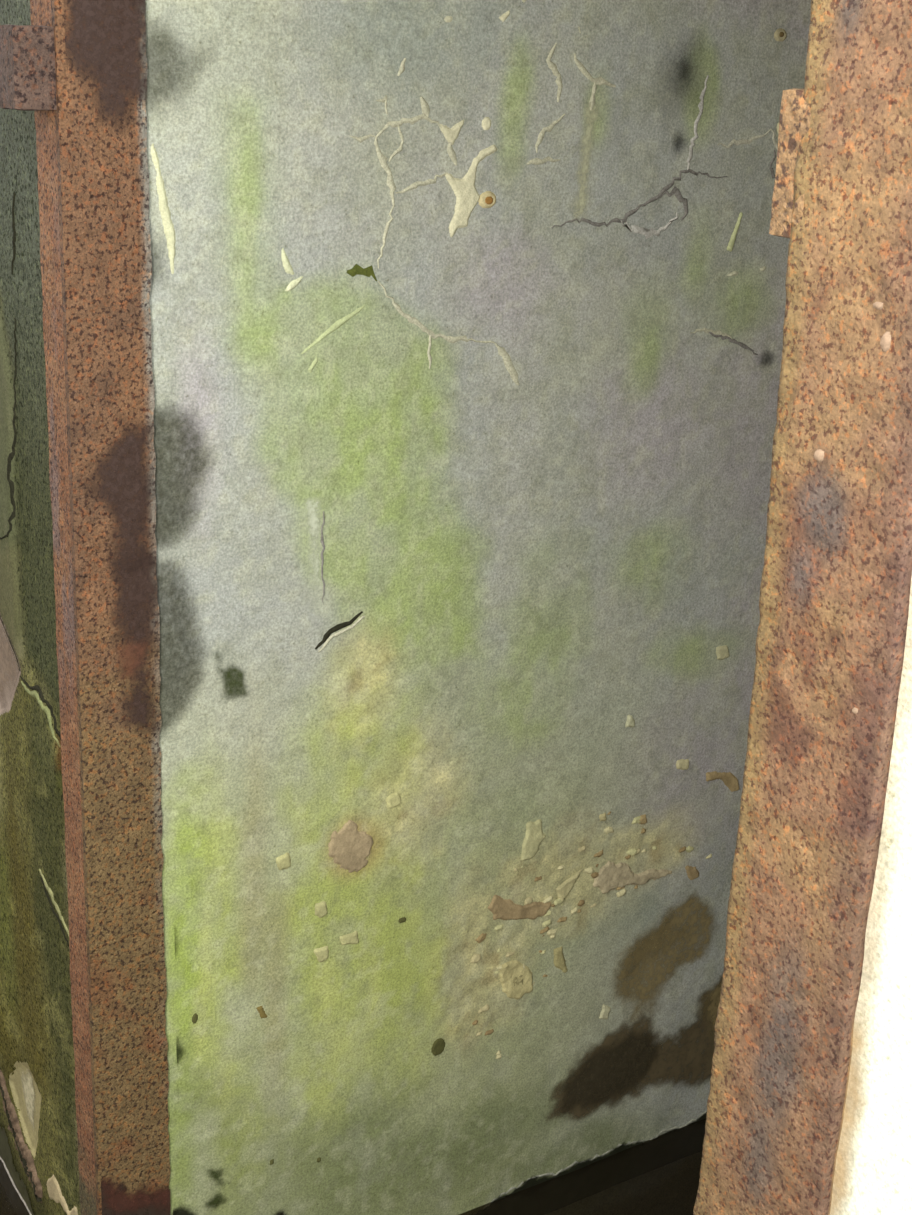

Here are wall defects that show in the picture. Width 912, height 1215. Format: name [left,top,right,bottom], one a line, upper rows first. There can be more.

crack [526,27,779,239]
crack [346,58,520,385]
crack [0,318,17,540]
crack [308,501,365,652]
flaking render [0,615,21,715]
peeling [470,812,712,999]
leakage [550,897,723,1119]
leakage [0,1126,34,1215]
flaking render [9,1061,42,1160]
flaking render [47,1174,78,1215]
leakage [101,1180,194,1215]
leakage [475,1111,707,1215]